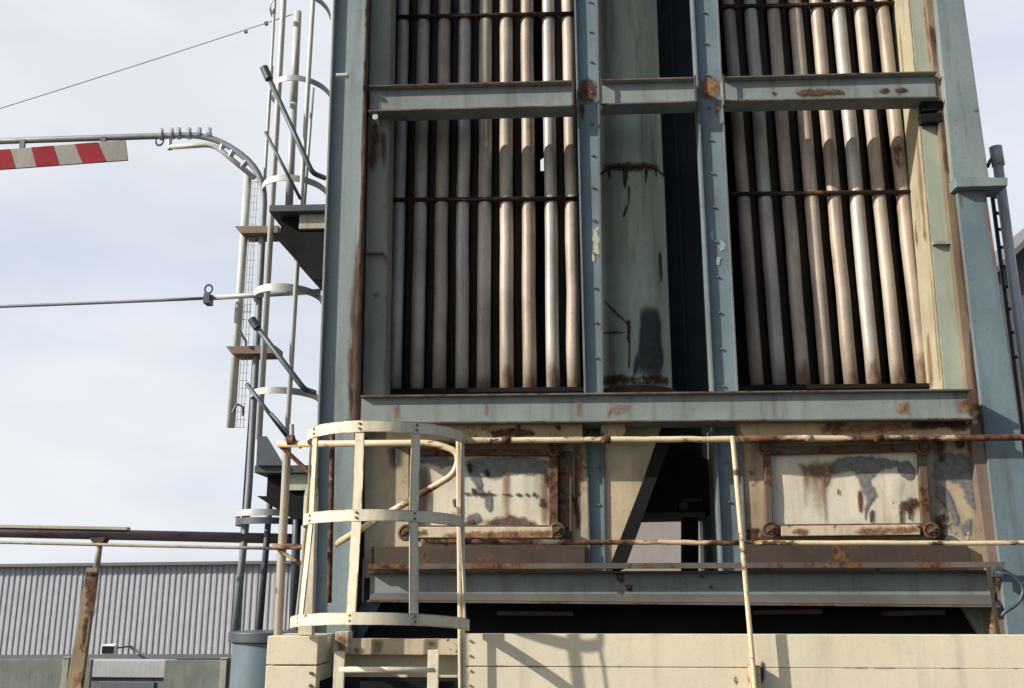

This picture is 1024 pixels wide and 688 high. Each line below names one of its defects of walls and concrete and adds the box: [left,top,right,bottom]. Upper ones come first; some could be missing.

rust [579,79,596,120]
rust [938,99,949,173]
rust [603,162,659,217]
rust [347,88,385,421]
rust [821,403,920,433]
rust [934,331,979,461]
peeling [420,456,549,524]
rust [446,472,551,538]
rust [803,463,839,518]
peeling [824,456,915,520]
peeling [932,453,976,541]
rust [82,574,99,644]